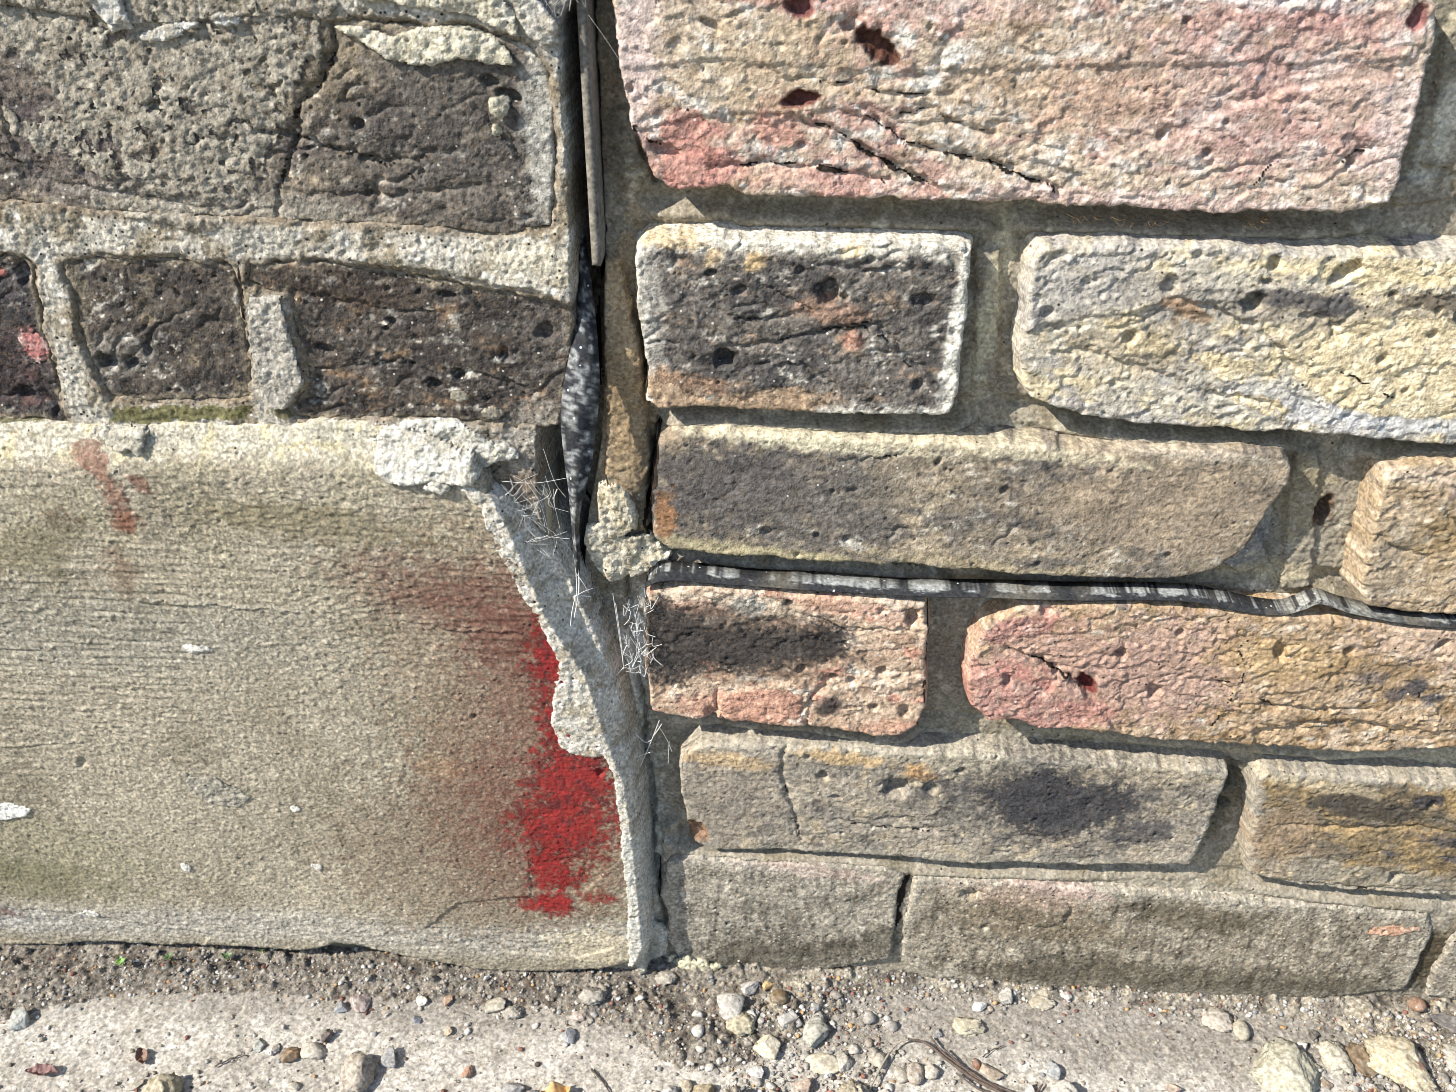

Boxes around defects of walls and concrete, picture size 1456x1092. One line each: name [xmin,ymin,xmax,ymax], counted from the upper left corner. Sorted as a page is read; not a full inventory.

crack [715,80,1055,193]
peeling [492,441,519,461]
peeling [423,480,450,495]
crack [1008,647,1079,685]
crack [895,874,911,927]